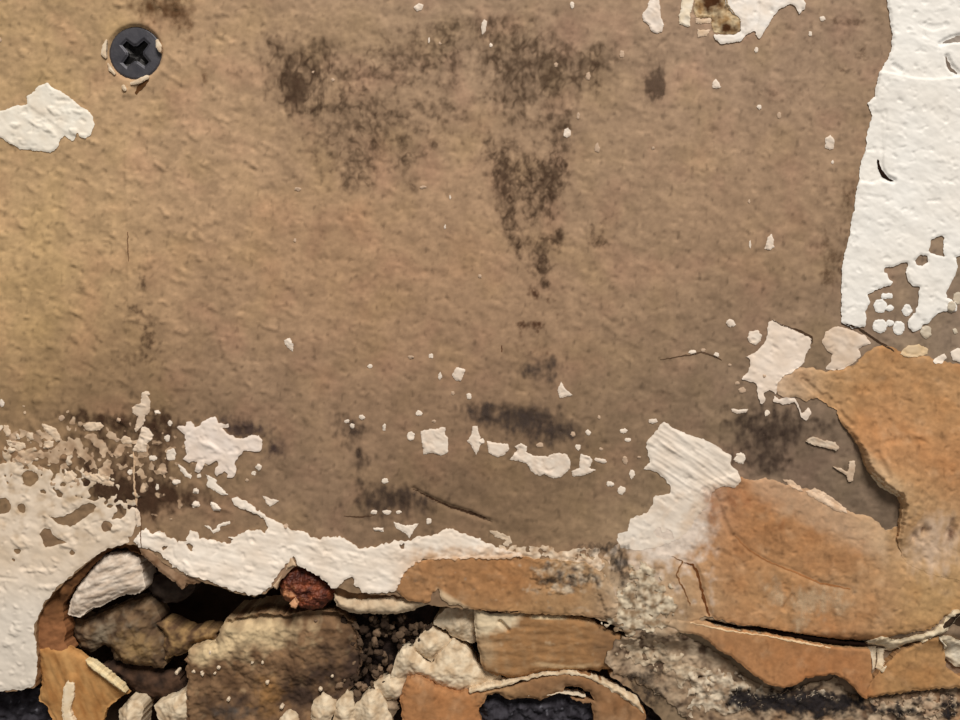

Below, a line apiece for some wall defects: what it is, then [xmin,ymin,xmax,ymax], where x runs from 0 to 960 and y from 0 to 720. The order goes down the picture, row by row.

leakage [281,56,319,105]
leakage [646,70,664,95]
peeling [742,0,960,420]
leakage [468,403,573,440]
leakage [356,487,427,510]
peeling [0,391,523,691]
crack [672,556,868,646]
leakage [726,686,921,719]
leakage [941,695,960,720]